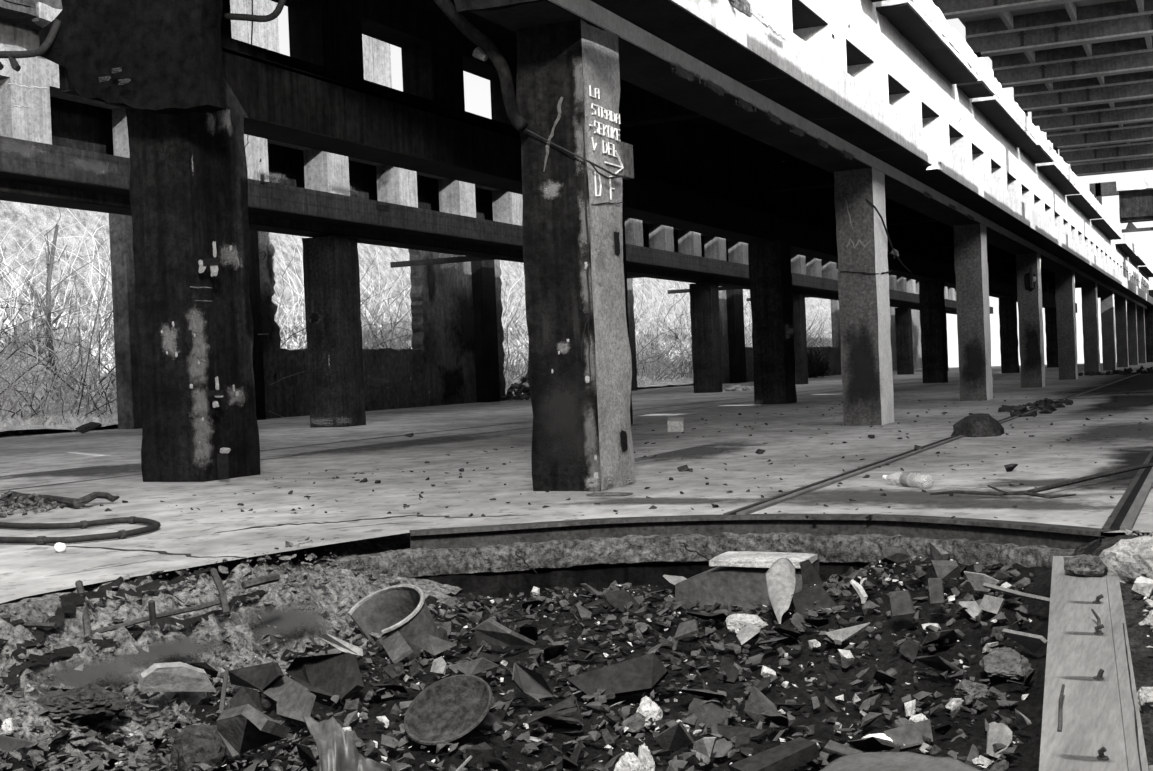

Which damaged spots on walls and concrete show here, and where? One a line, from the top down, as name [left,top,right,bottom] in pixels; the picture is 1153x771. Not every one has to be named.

spalling [161,310,213,465]